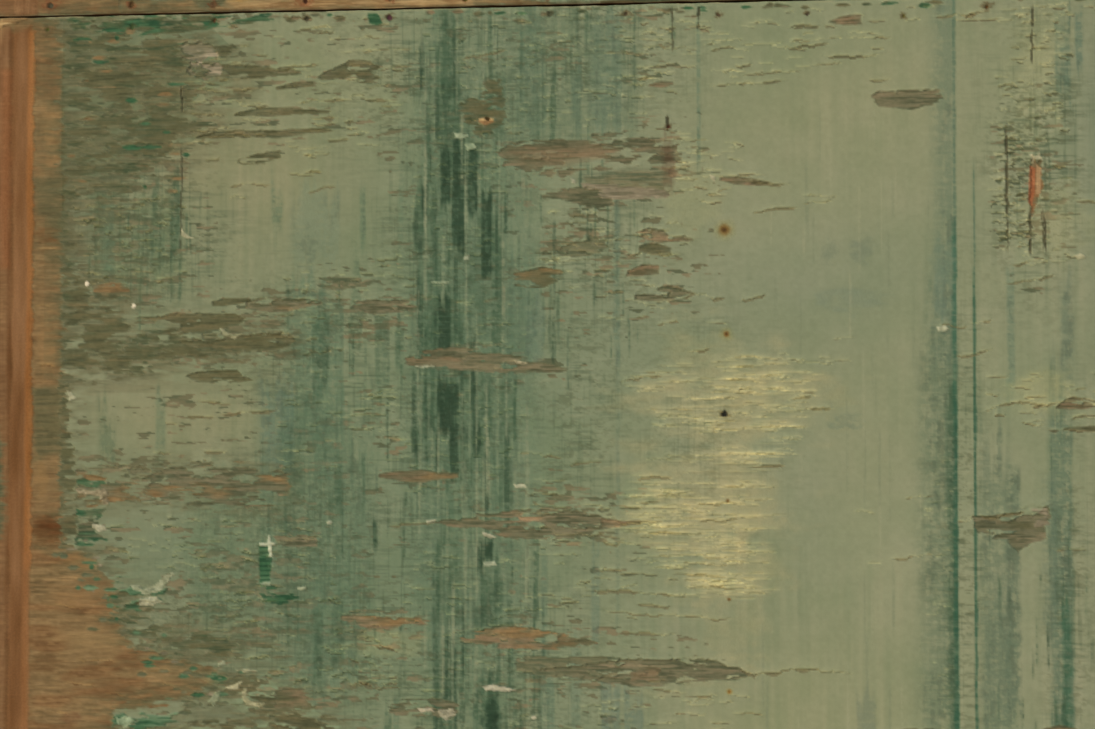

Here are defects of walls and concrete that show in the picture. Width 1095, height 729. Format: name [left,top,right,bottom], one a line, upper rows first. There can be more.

peeling [870,87,945,111]
peeling [457,79,686,209]
peeling [0,0,570,729]
peeling [975,502,1052,554]
peeling [459,627,748,688]